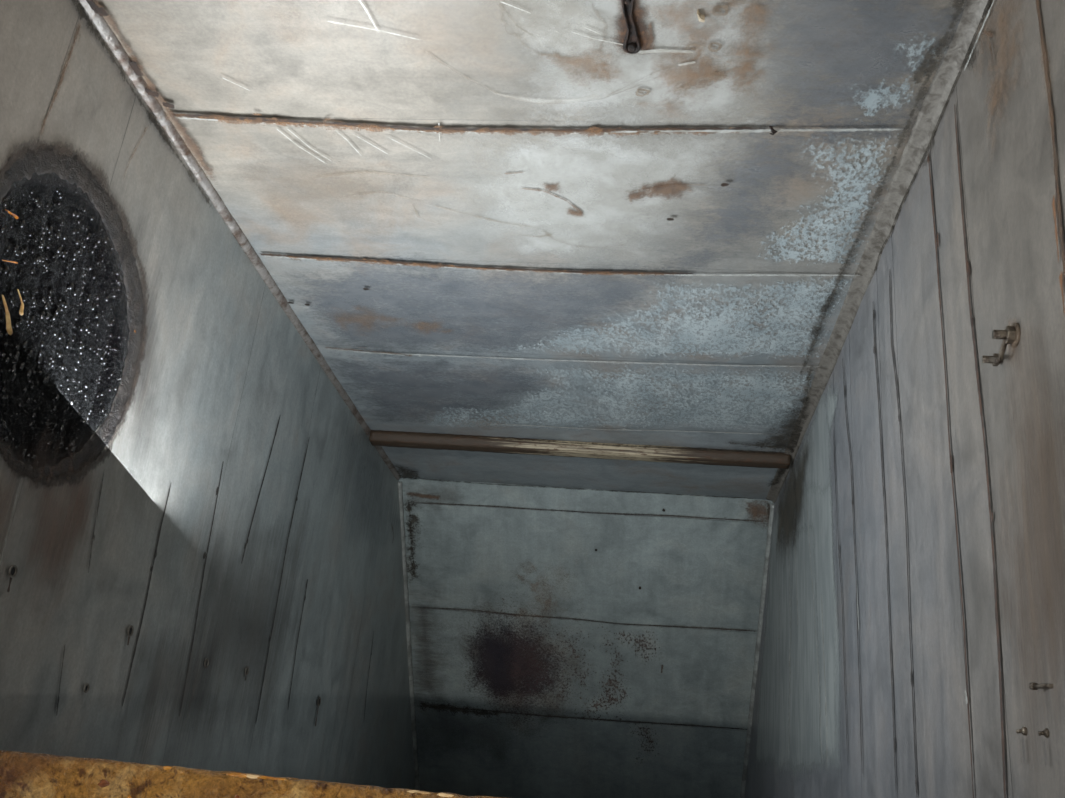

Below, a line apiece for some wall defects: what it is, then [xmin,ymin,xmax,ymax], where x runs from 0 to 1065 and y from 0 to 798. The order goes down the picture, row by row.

corrosion [86,0,766,175]
water stain [851,39,935,116]
corrosion [522,184,582,216]
corrosion [629,178,693,201]
corrosion [261,253,693,276]
water stain [384,0,898,777]
corrosion [576,631,663,764]